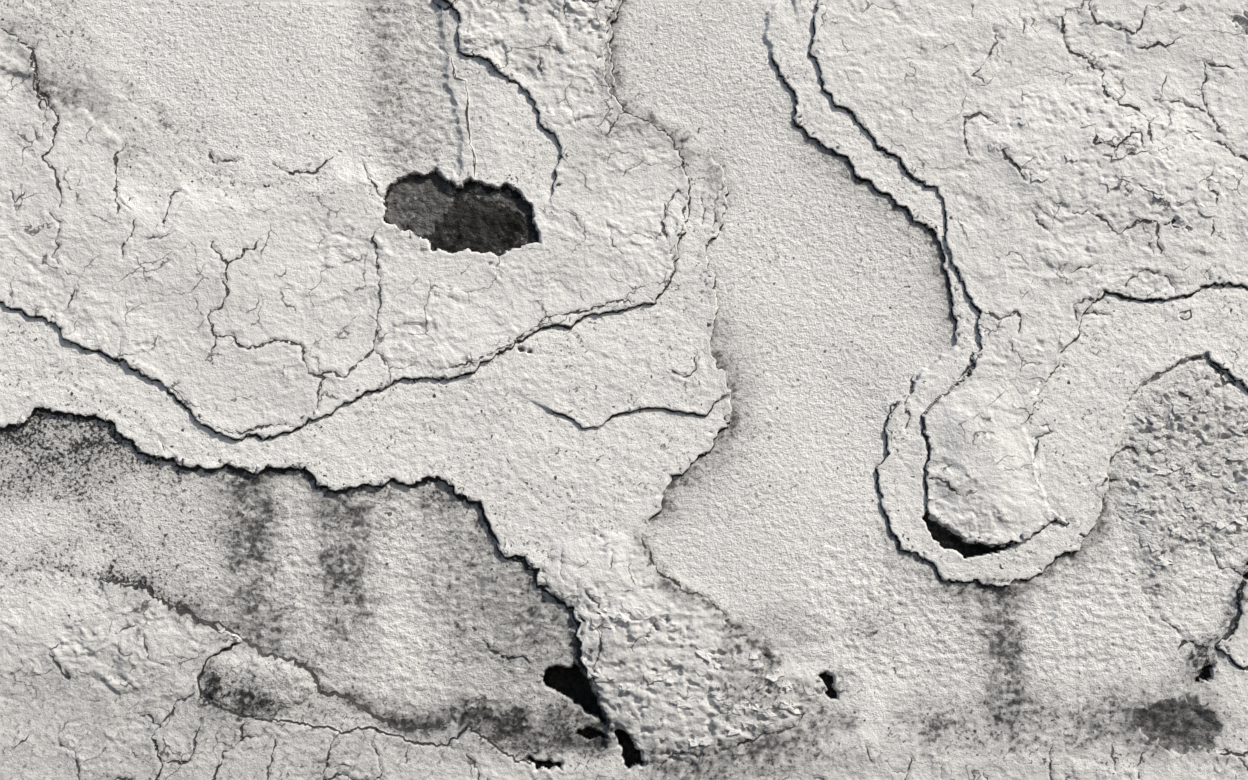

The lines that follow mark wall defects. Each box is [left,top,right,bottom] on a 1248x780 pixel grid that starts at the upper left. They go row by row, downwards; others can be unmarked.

crack [32,45,62,264]
peeling [0,0,569,256]
crack [207,226,386,408]
crack [1032,187,1219,327]
crack [1060,0,1248,161]
damp [215,464,385,693]
peeling [0,400,610,755]
damp [379,485,619,761]
spalling [922,512,1012,559]
damp [886,473,1226,758]
crack [114,692,277,780]
spalling [615,729,644,769]